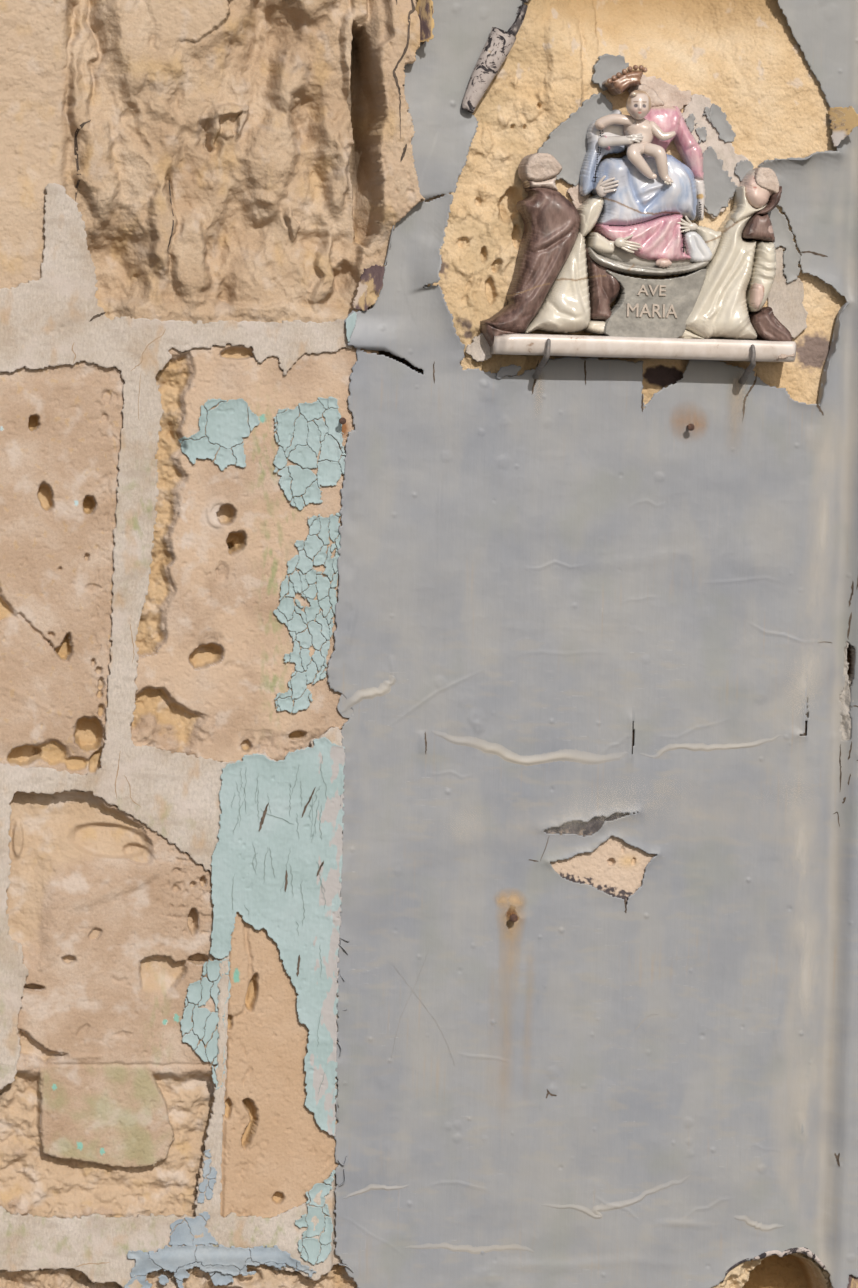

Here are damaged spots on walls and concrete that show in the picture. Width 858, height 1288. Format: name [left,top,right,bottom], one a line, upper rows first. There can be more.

spalling [0,0,858,408]
spalling [0,343,379,1288]
peeling [550,836,657,905]
crack [800,697,809,736]
crack [819,578,858,827]
spalling [711,1247,858,1288]